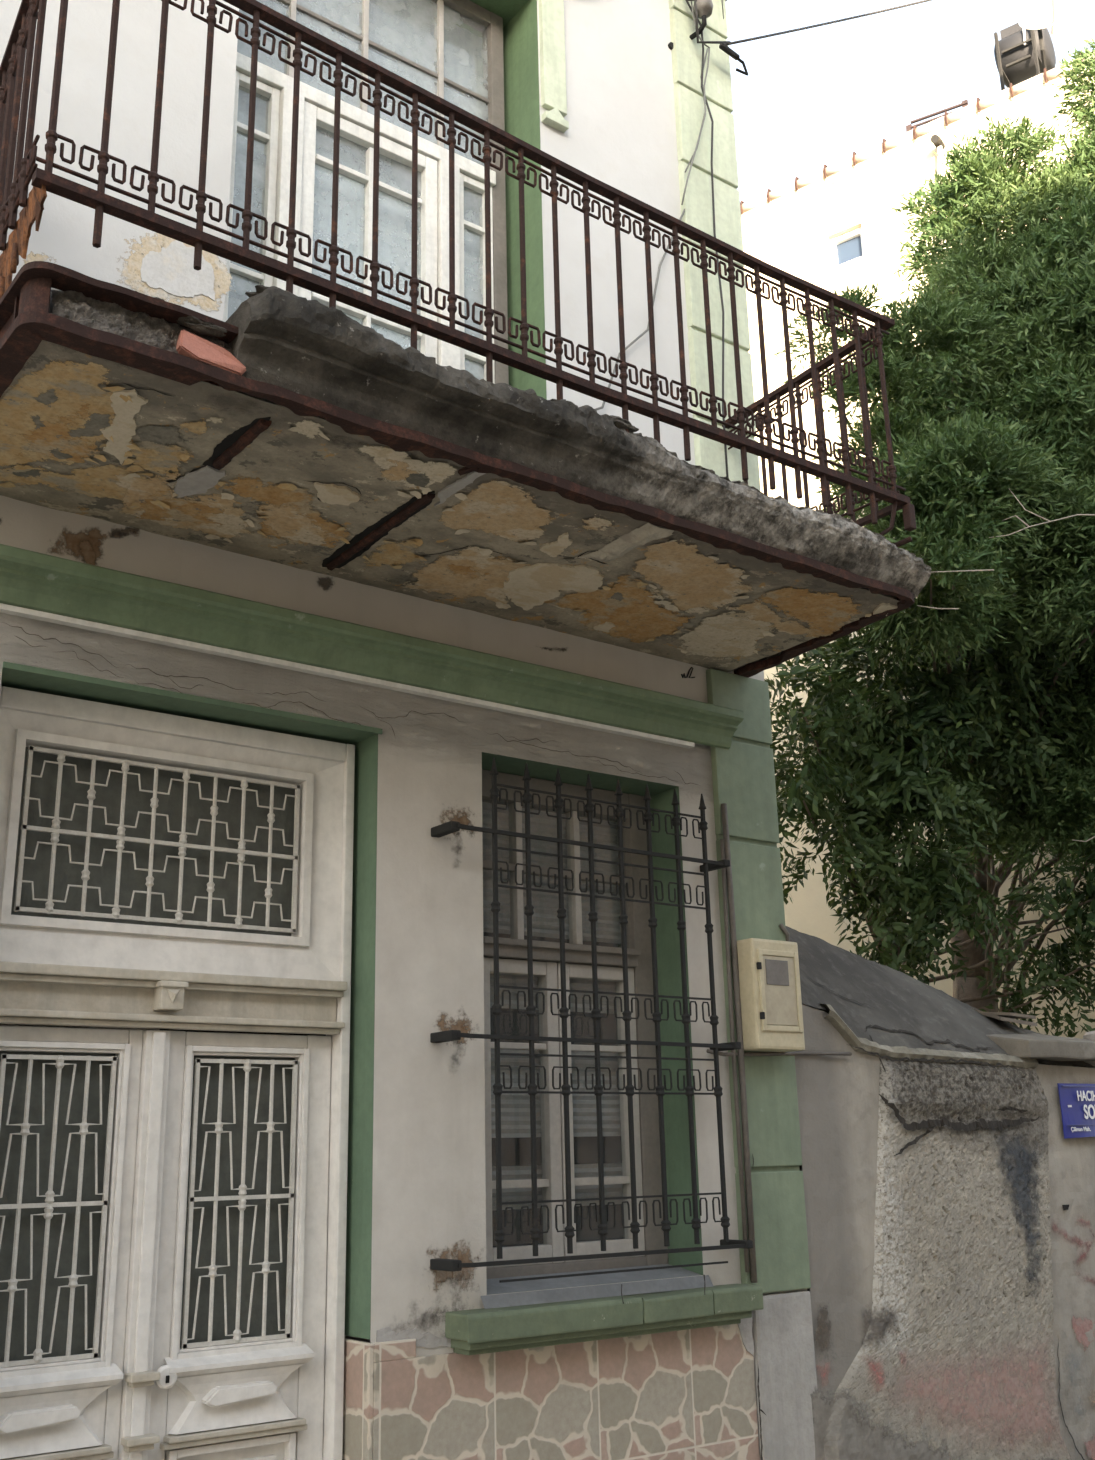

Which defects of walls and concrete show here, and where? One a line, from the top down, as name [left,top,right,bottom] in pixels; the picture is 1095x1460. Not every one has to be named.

peeling [116,233,236,312]
flaking render [176,330,246,387]
peeling [0,360,897,660]
rust [51,527,139,566]
rust [438,1013,472,1060]
rust [427,1243,479,1291]